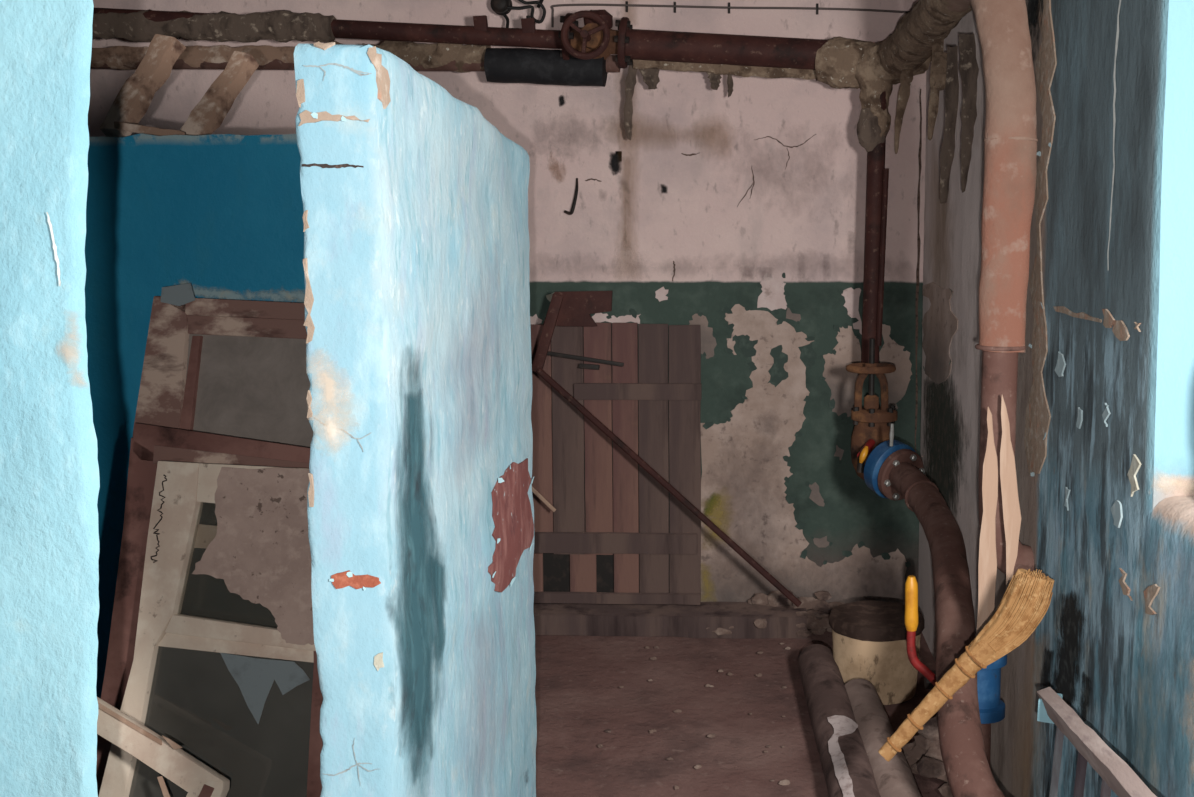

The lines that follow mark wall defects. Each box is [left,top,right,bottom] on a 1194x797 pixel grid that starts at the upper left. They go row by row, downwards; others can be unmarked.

flaking render [296,79,370,126]
crack [302,161,364,169]
flaking render [367,46,391,109]
peeling [590,308,644,324]
peeling [655,287,668,302]
peeling [879,282,959,410]
peeling [1024,0,1141,476]
peeling [689,273,911,611]
flaking render [329,570,381,591]
leakage [396,360,445,779]
peeling [488,458,534,592]
leakage [1040,591,1090,721]